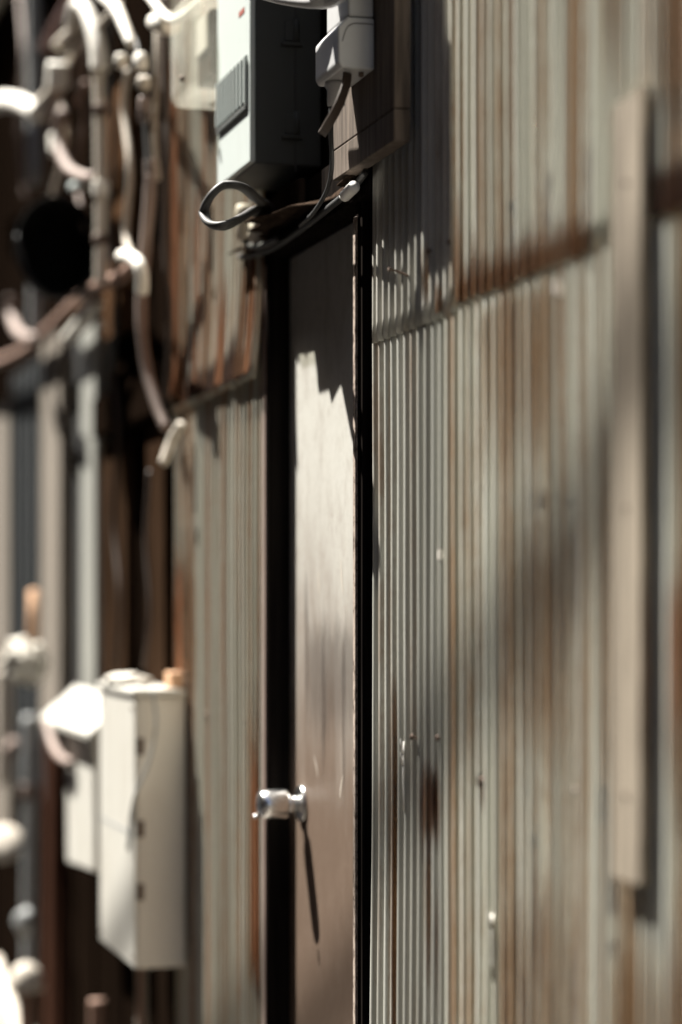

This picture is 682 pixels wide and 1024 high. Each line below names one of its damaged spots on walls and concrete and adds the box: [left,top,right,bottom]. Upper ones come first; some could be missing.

corrosion [456,228,589,301]
corrosion [424,776,439,834]